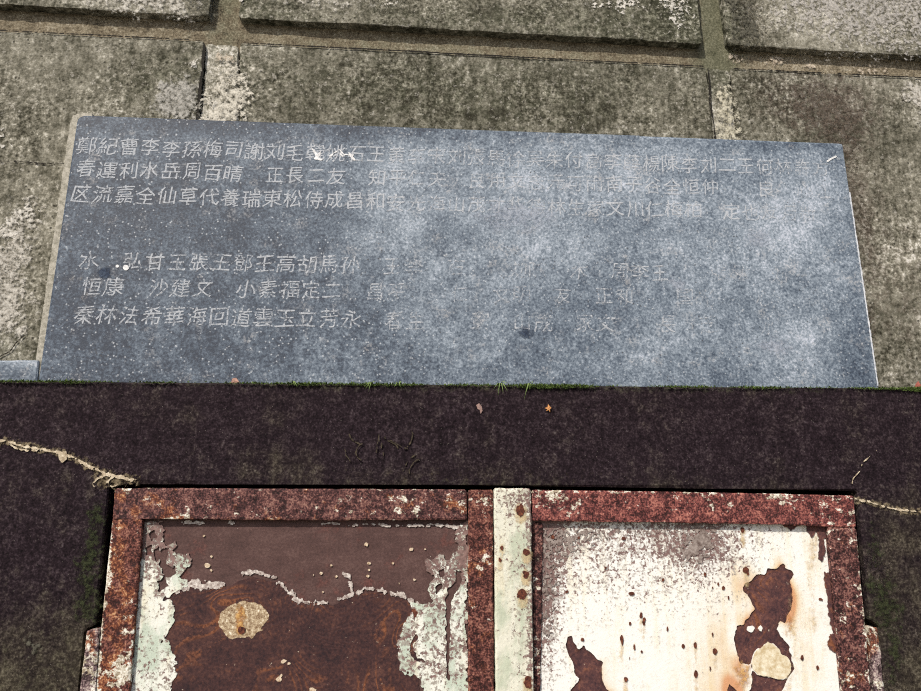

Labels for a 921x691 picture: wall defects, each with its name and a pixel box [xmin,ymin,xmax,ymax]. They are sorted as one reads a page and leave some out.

crack [0,437,140,488]
crack [852,450,921,515]
peeling [131,519,192,691]
corrosion [161,577,420,691]
peeling [397,521,468,691]
corrosion [566,636,608,691]
peeling [541,522,721,637]
corrosion [727,564,804,691]